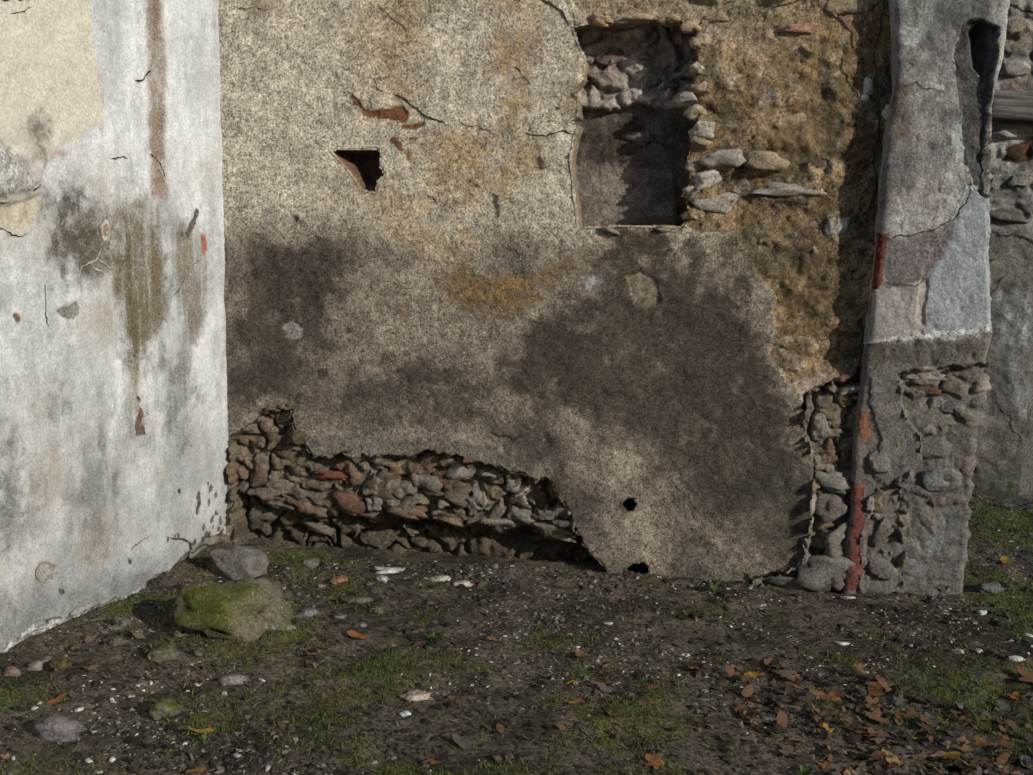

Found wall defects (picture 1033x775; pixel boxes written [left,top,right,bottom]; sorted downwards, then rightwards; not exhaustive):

damp [50,0,207,404]
spalling [350,96,423,162]
flaking render [590,11,827,232]
flaking render [860,77,873,102]
crack [762,0,981,239]
peeling [864,17,1033,345]
spalling [168,403,606,570]